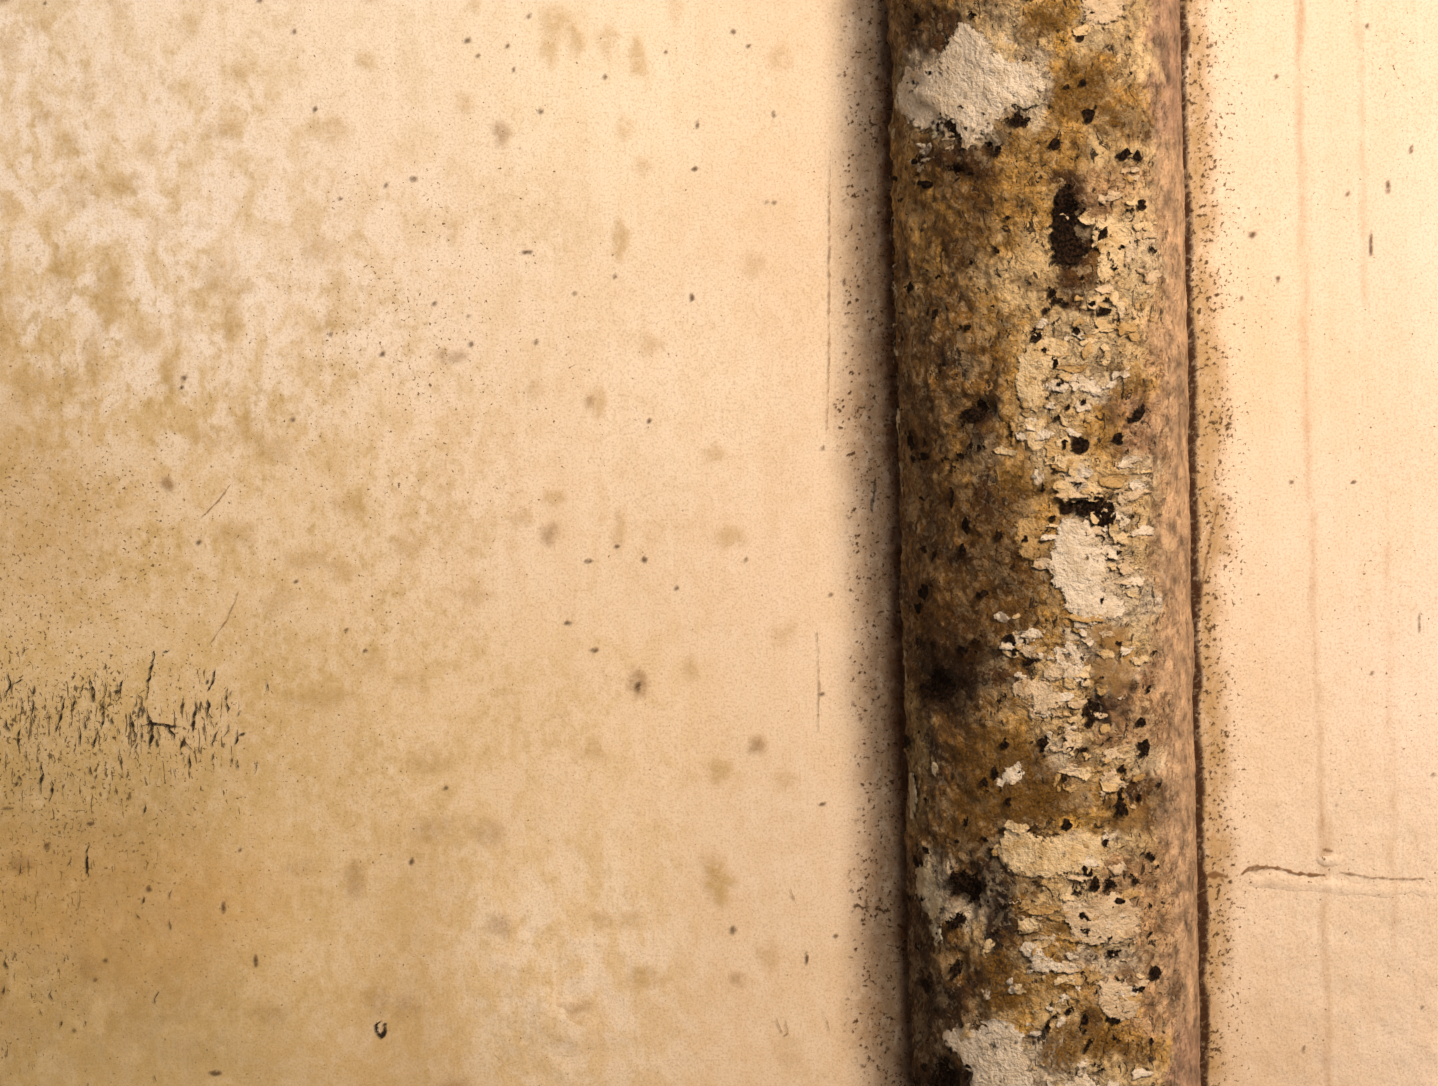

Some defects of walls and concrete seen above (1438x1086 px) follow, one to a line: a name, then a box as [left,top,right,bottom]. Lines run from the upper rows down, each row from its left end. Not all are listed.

peeling [894,11,1046,189]
spalling [1048,138,1061,151]
corrosion [1052,64,1121,130]
water stain [834,0,911,1086]
water stain [1180,0,1236,1085]
peeling [903,148,1165,1086]
corrosion [953,728,1062,840]
crack [1201,849,1424,880]
corrosion [979,950,1027,1009]
corrosion [1041,1020,1120,1071]